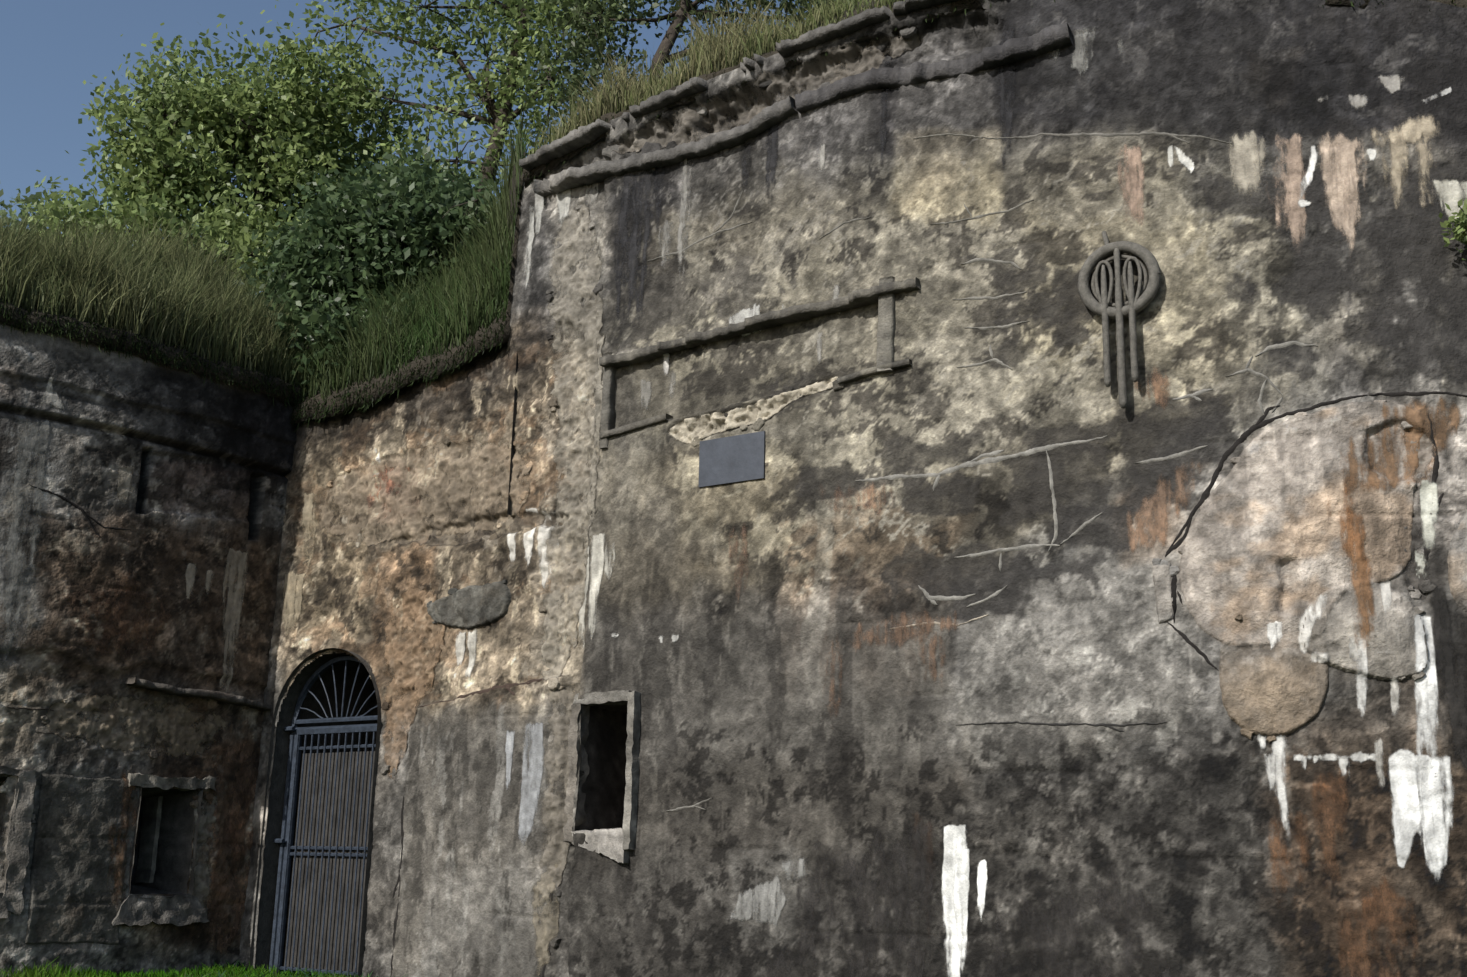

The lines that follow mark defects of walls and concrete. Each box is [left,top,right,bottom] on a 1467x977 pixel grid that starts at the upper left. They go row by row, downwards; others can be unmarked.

crack [856,436,1107,629]
crack [1134,341,1467,671]
water stain [1380,582,1392,611]
corrosion [1340,398,1460,639]
water stain [1415,480,1438,578]
water stain [1258,587,1467,874]
water stain [731,820,1150,977]